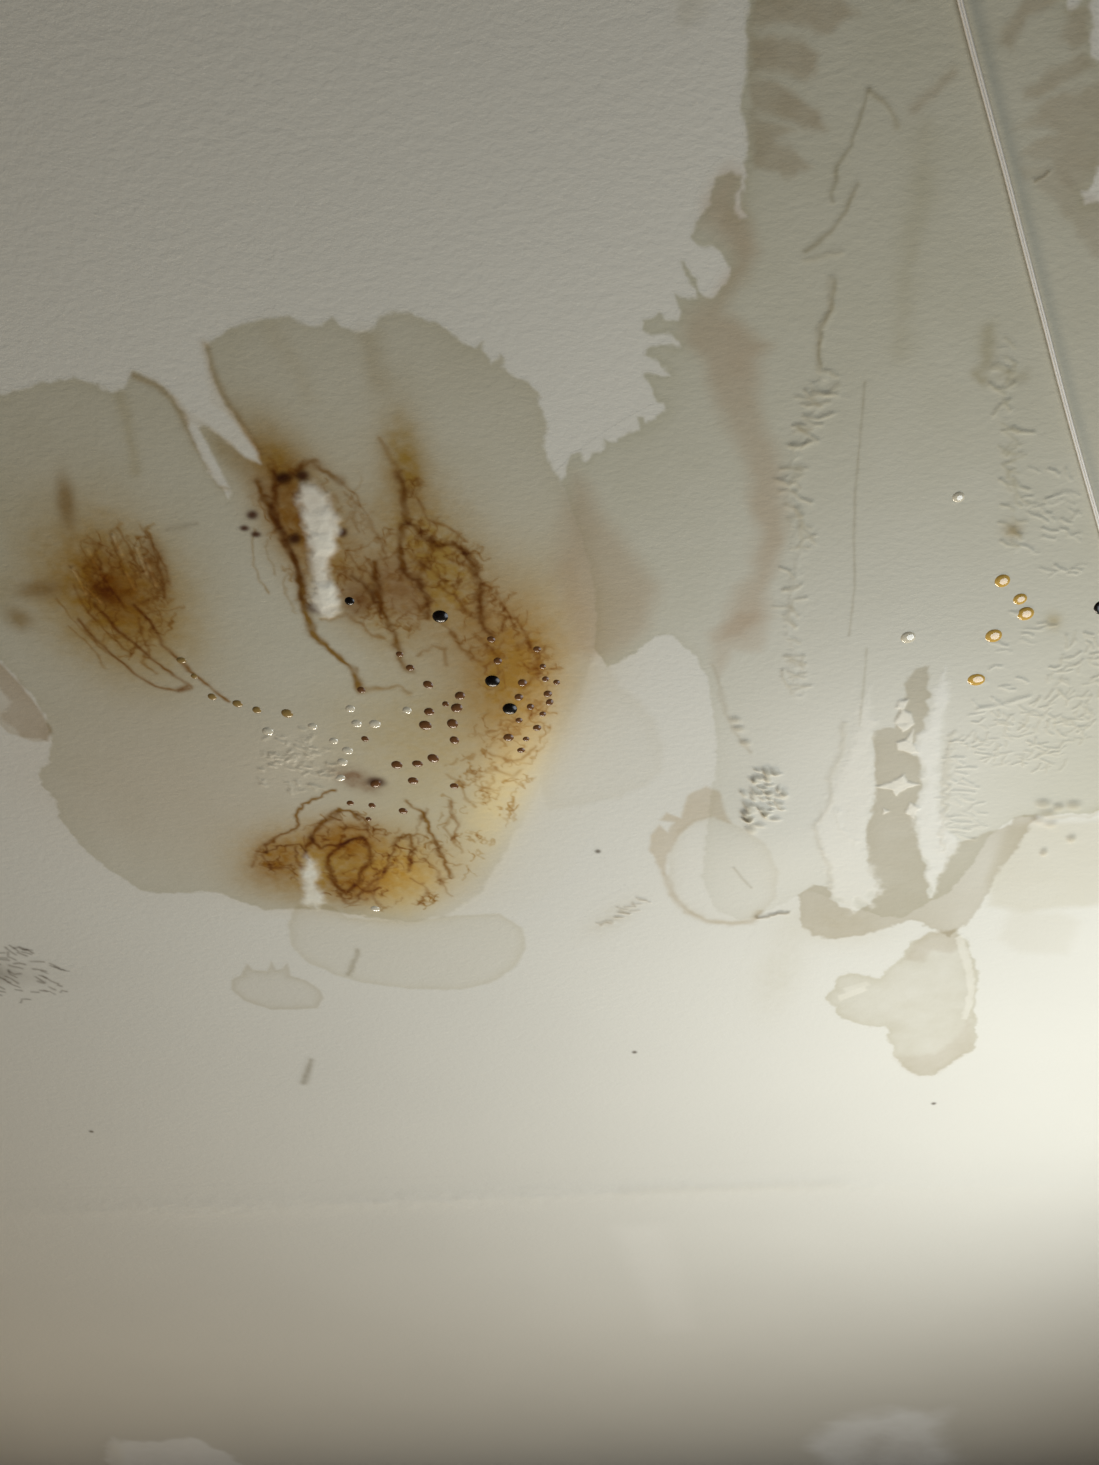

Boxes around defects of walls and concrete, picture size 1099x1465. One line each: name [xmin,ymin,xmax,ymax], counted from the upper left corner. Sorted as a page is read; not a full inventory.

damp [640,0,1099,403]
damp [0,308,579,1011]
peeling [290,476,345,621]
corrosion [0,369,660,946]
damp [735,920,983,1079]
damp [991,896,1099,959]